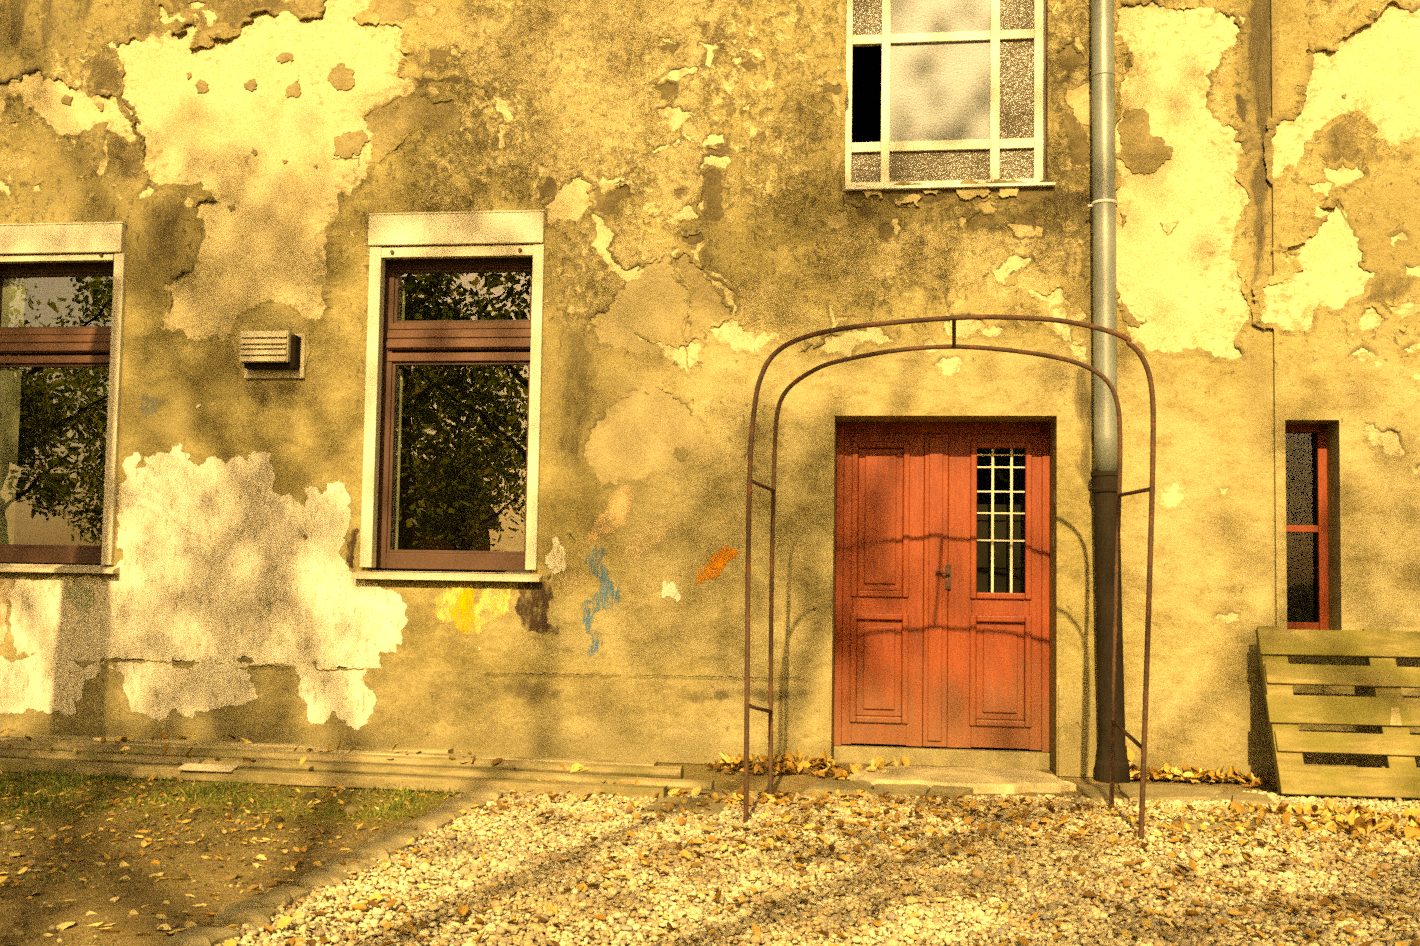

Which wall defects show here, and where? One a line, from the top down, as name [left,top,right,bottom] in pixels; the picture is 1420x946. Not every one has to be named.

damp [10,0,26,45]
flaking render [0,0,1093,494]
flaking render [1114,0,1420,386]